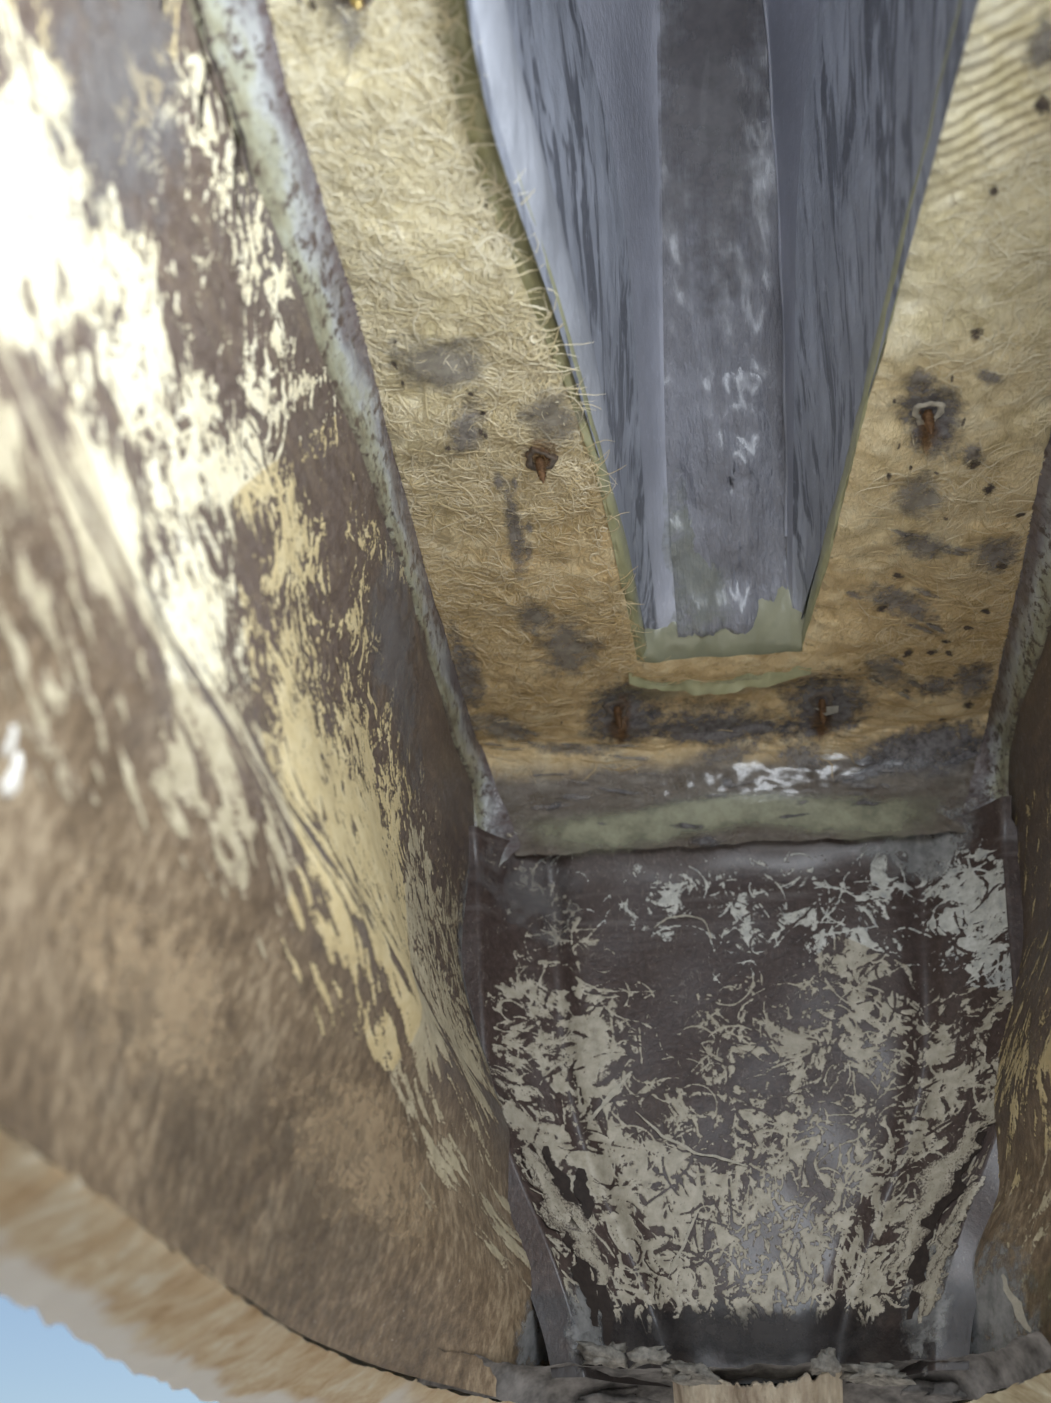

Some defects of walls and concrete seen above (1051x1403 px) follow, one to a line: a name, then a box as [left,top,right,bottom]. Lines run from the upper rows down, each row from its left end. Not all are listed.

water stain [297,0,360,48]
water stain [1034,95,1051,115]
water stain [391,340,477,396]
water stain [445,411,488,451]
water stain [448,573,993,809]
peeling [618,898,681,942]
peeling [732,1085,747,1096]
peeling [489,1181,511,1215]
peeling [471,1223,521,1273]
peeling [985,1183,1051,1275]